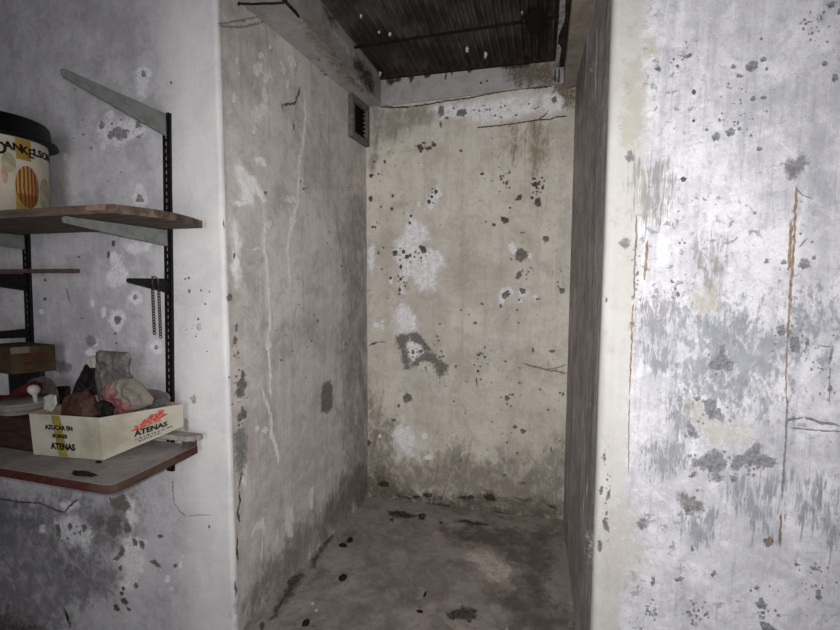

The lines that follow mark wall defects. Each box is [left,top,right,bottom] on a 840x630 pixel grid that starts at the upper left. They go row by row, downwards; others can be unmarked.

crack [282,89,300,128]
crack [477,110,567,128]
leakage [624,94,676,238]
leakage [230,220,242,288]
corrosion [785,188,798,390]
leakage [639,235,840,483]
crack [781,397,840,498]
crack [0,499,77,513]
leakage [0,497,129,630]
leakage [251,399,570,624]
leakage [677,489,718,548]
leakage [732,470,839,561]